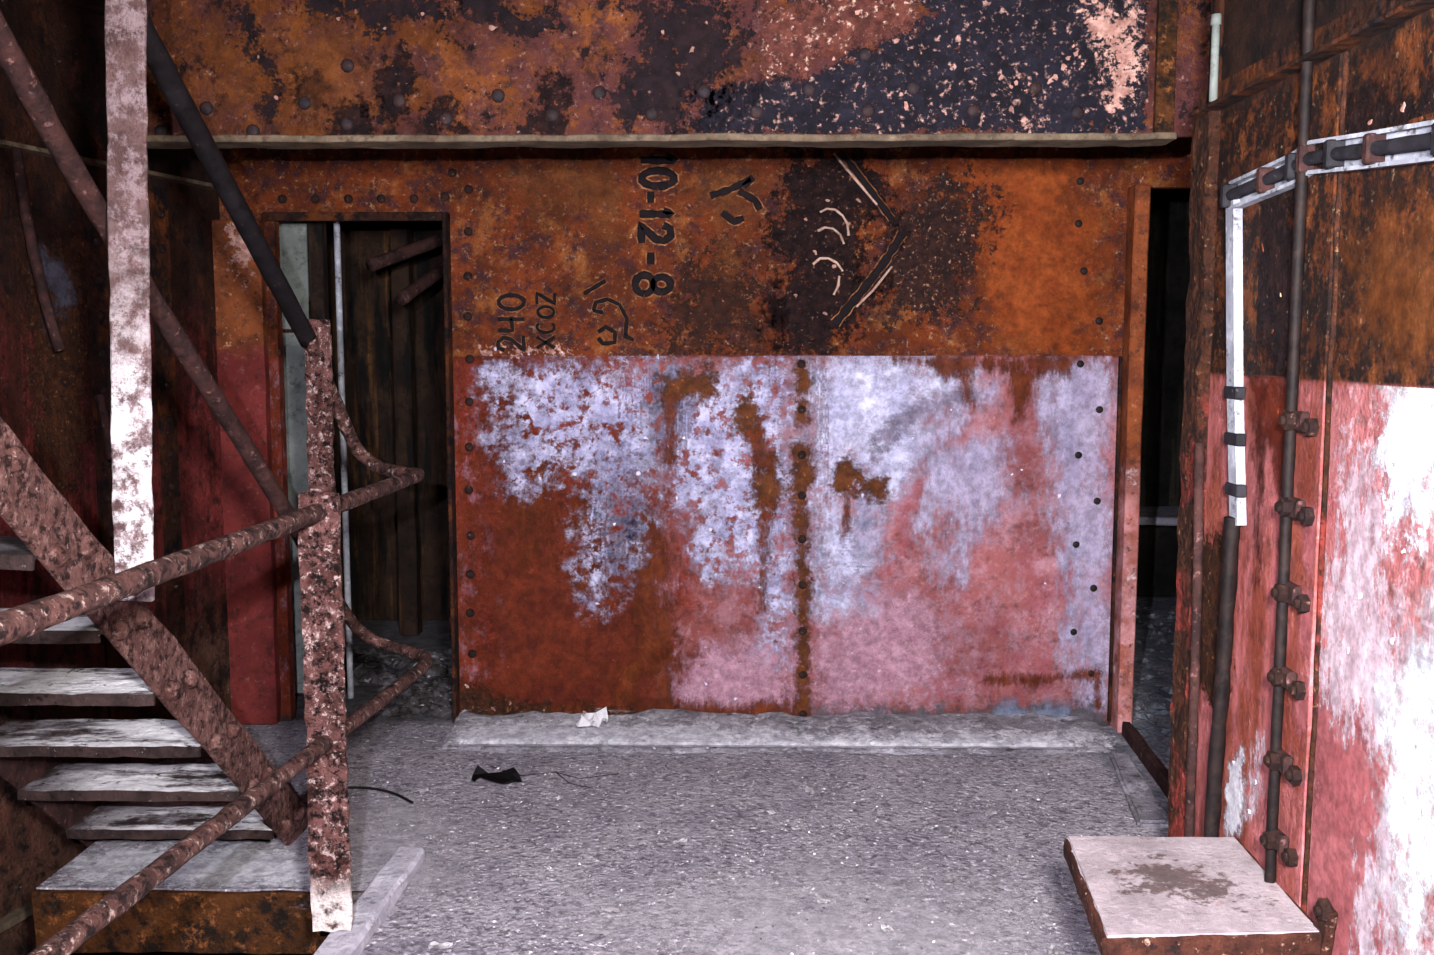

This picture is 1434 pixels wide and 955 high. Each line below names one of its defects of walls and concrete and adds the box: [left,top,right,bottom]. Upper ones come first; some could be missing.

rust [285,39,471,135]
rust [526,67,574,135]
rust [892,147,1109,424]
rust [459,359,891,717]
peeling [473,347,980,671]
rust [1200,525,1236,710]
rust [1249,376,1286,584]
rust [1293,679,1308,733]
rust [1298,504,1317,657]
peeling [1319,387,1434,949]